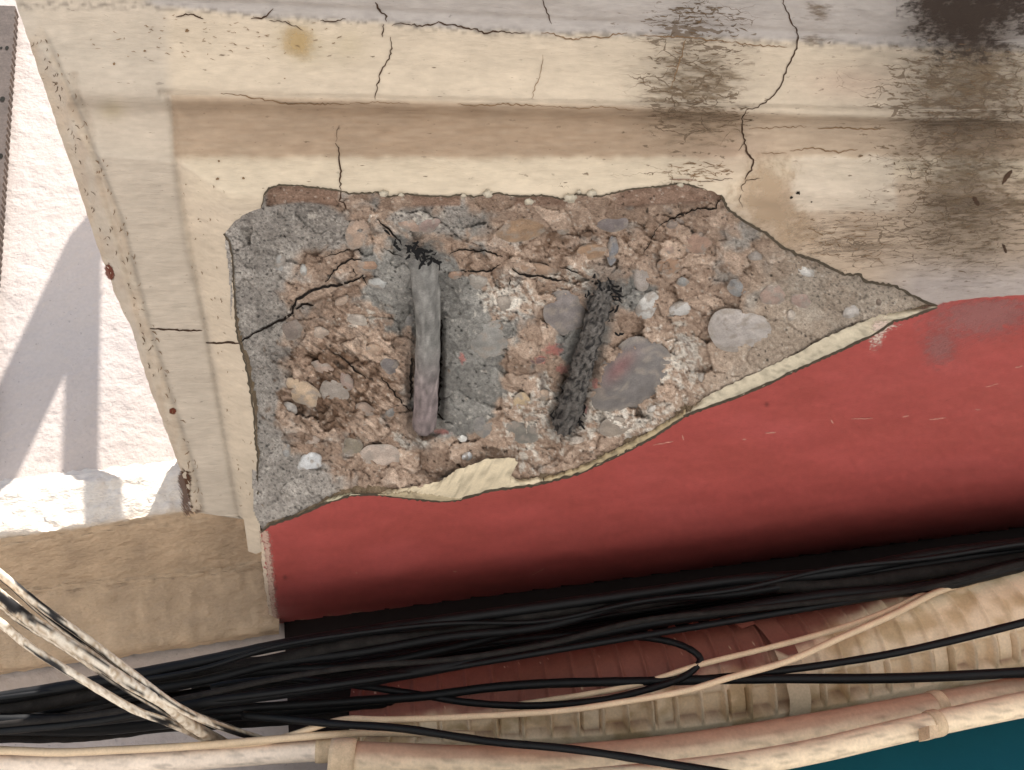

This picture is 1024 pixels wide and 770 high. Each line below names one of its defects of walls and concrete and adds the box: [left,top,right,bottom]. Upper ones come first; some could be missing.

crack [221,2,407,210]
damp [652,47,742,132]
crack [461,0,1024,273]
damp [906,0,1024,120]
crack [150,218,402,344]
crack [333,353,414,411]
spalling [223,179,938,619]